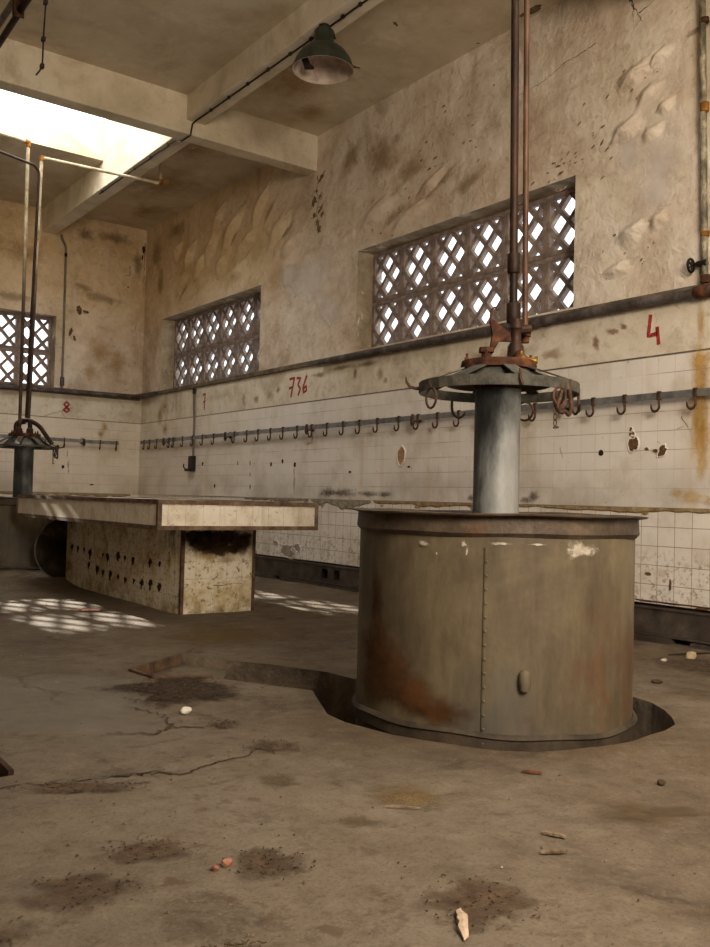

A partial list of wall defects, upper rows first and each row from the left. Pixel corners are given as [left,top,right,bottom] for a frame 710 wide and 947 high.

corrosion [695,353,707,469]
spalling [627,426,640,454]
spalling [652,443,669,459]
peeling [244,497,473,510]
crack [106,706,204,735]
crack [0,749,256,795]